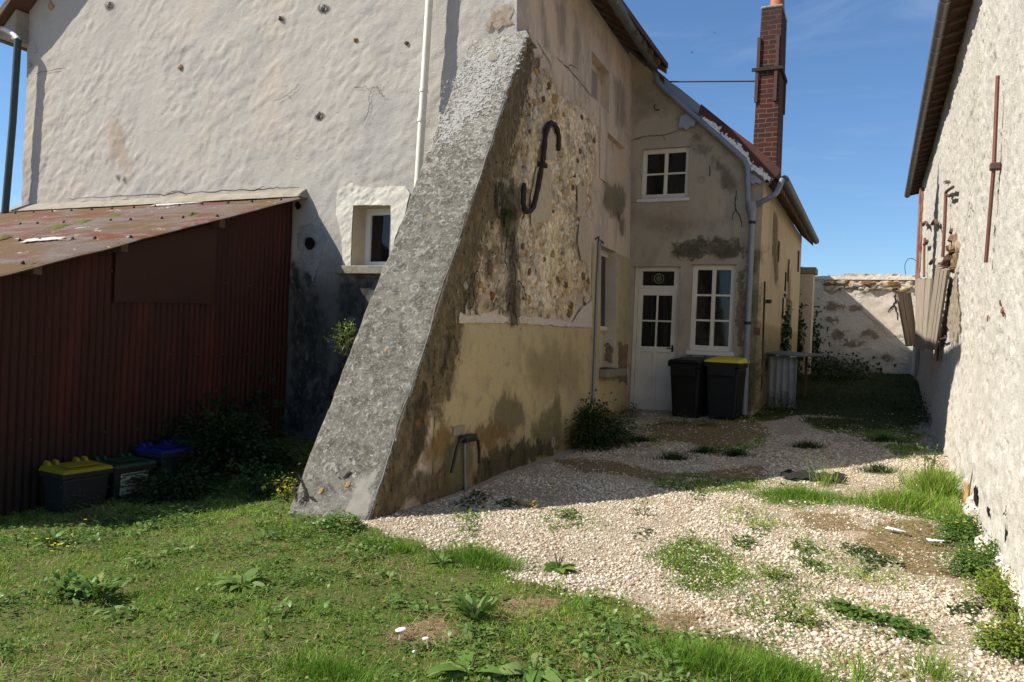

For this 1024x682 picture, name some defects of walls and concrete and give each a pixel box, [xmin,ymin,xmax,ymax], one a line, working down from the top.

flaking render [485,4,515,33]
crack [69,186,299,200]
water stain [371,33,559,520]
flaking render [459,67,599,328]